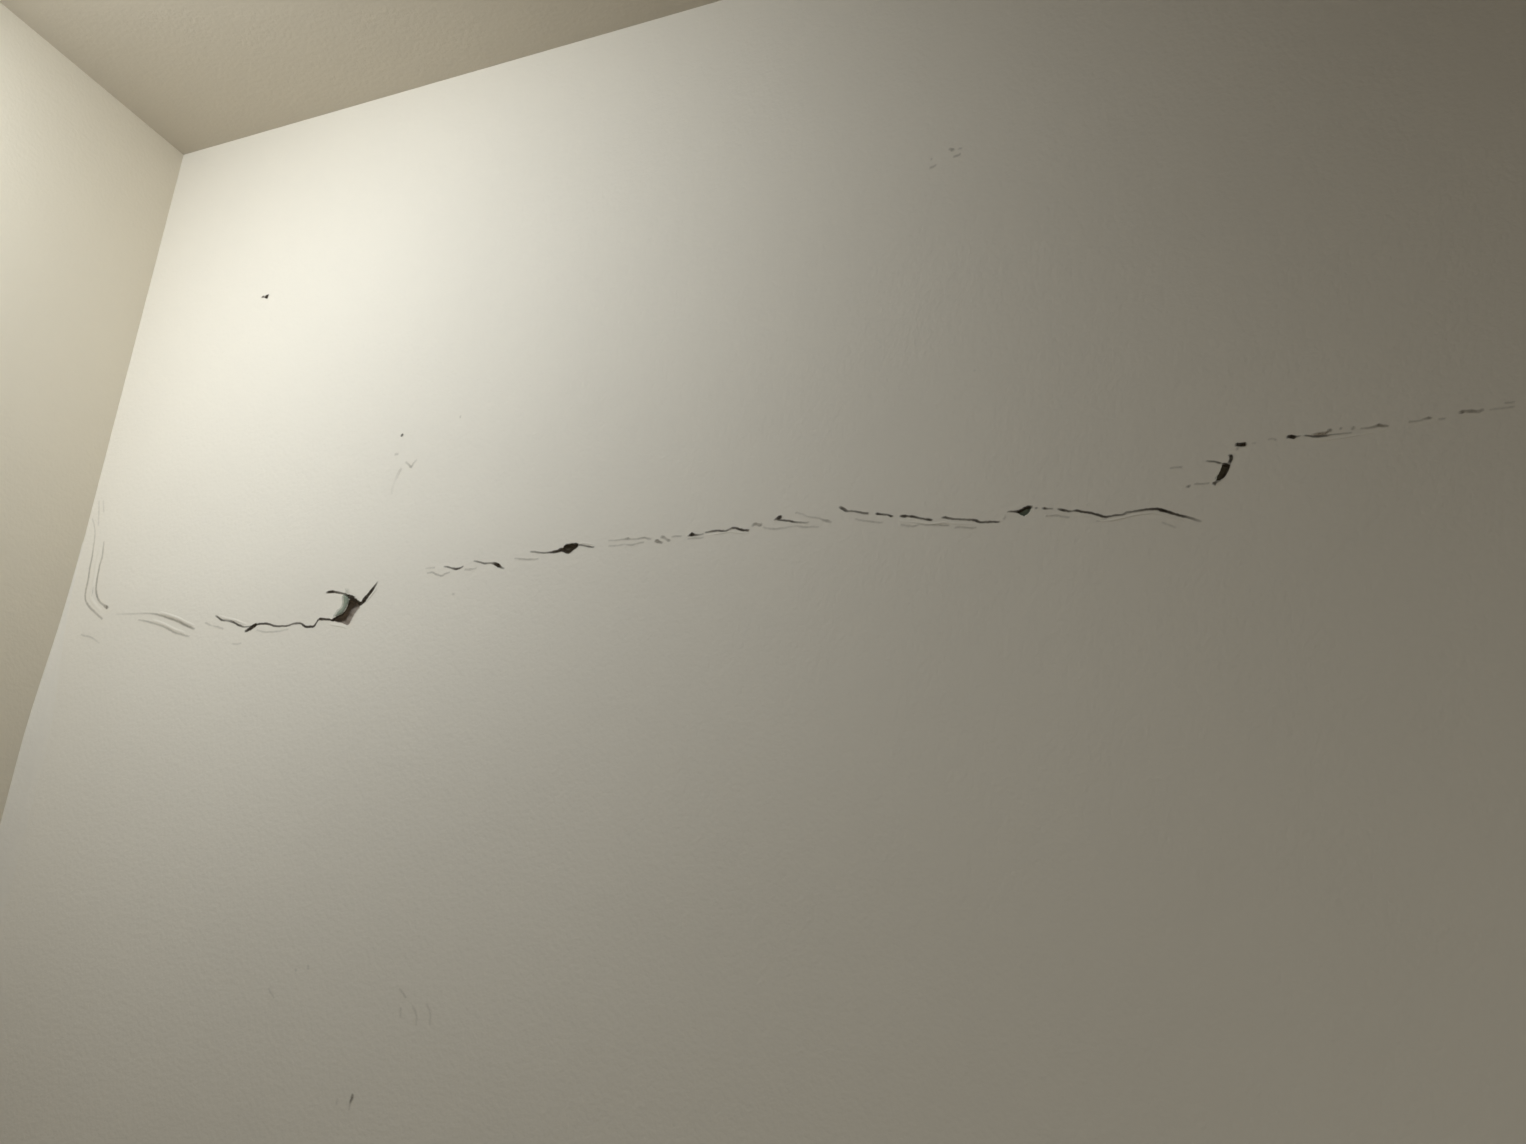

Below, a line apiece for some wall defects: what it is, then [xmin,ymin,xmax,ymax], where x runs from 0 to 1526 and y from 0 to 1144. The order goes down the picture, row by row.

crack [1287,424,1385,442]
crack [689,515,794,536]
crack [840,507,997,526]
crack [1044,507,1186,522]
spalling [319,584,378,629]
crack [217,615,318,632]